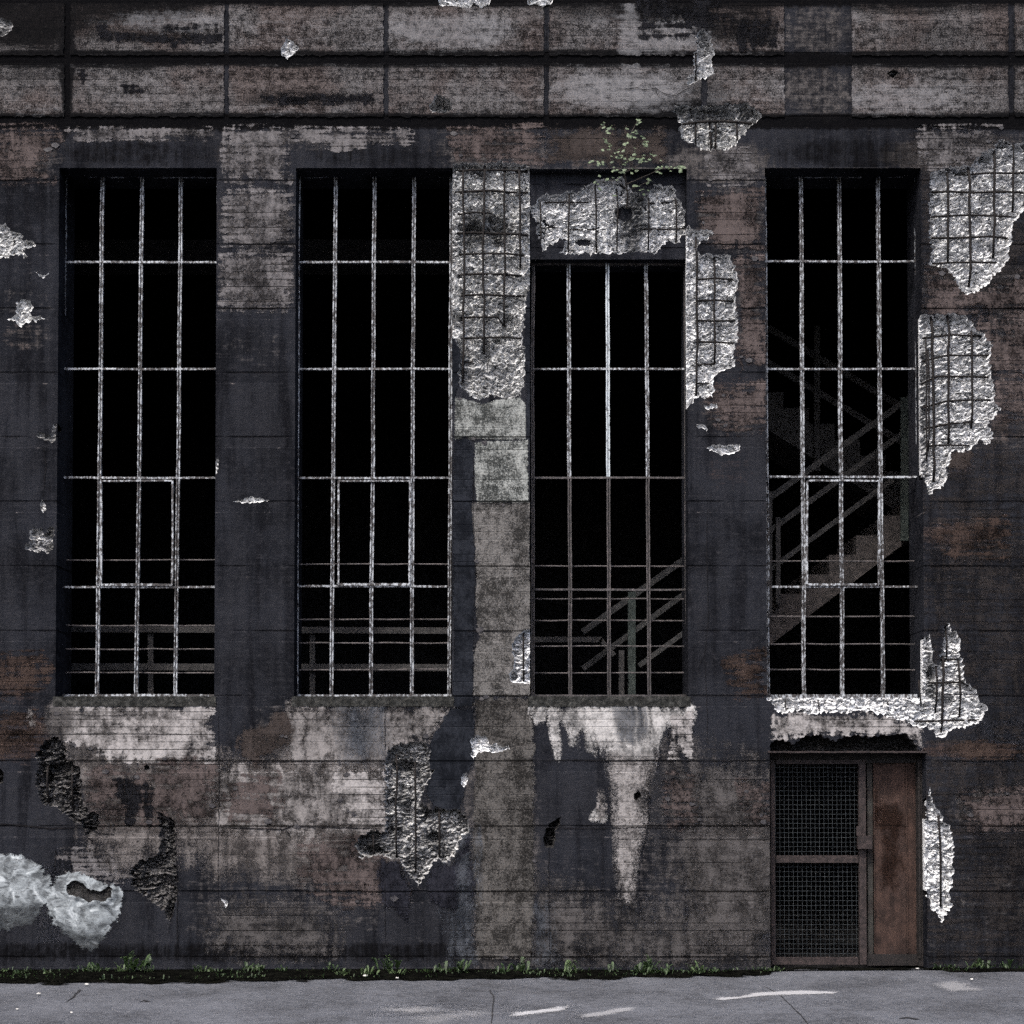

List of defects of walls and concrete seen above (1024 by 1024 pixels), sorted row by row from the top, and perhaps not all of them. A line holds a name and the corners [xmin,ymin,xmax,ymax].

spalling [0,223,36,258]
spalling [907,123,1024,494]
spalling [35,102,988,968]
leakage [527,704,697,903]
corrosion [873,790,908,886]